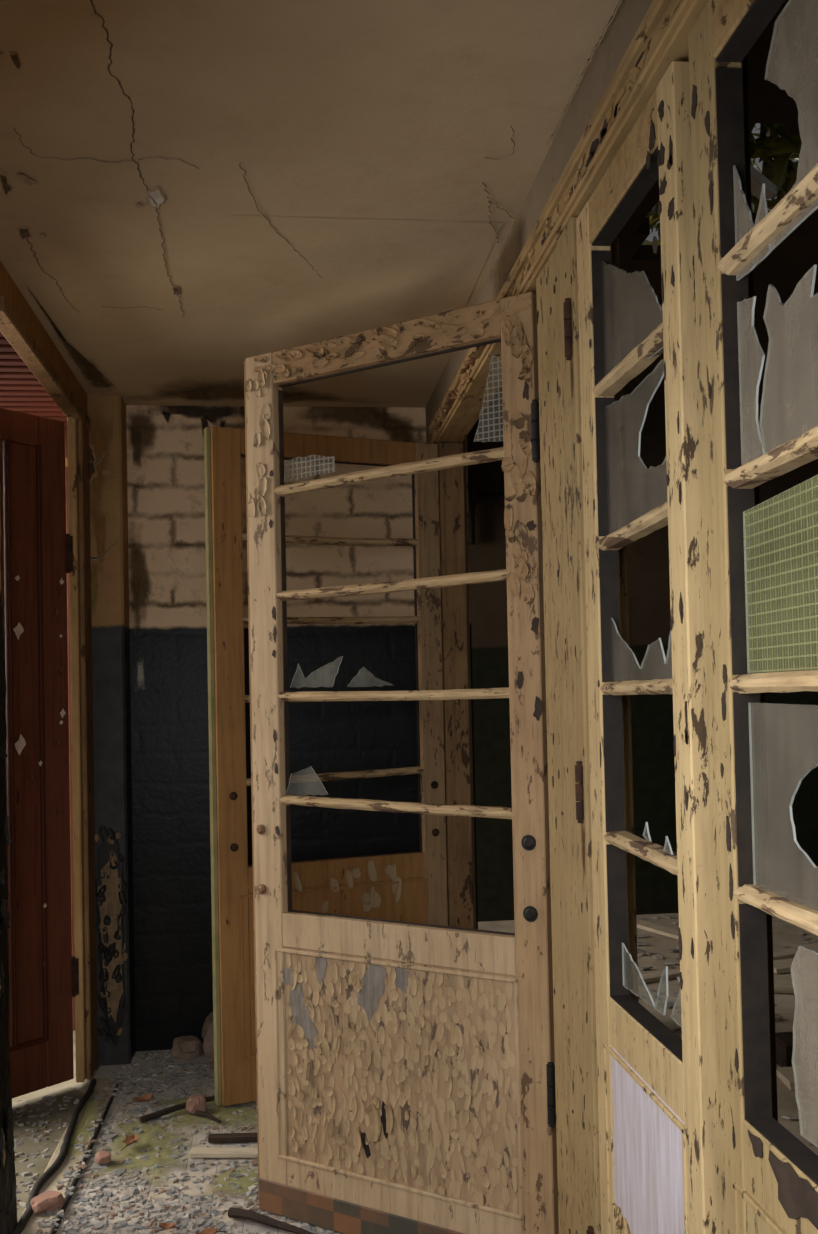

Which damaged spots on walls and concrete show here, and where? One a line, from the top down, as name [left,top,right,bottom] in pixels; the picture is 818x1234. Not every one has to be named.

crack [14,0,199,317]
crack [239,163,322,278]
peeling [646,100,674,221]
peeling [691,84,710,136]
peeling [670,592,683,631]
peeling [673,701,688,756]
peeling [95,825,128,1048]
peeling [678,927,694,990]
peeling [726,816,735,939]
peeling [284,952,518,1214]
peeling [611,1047,685,1234]
peeling [732,1126,818,1230]